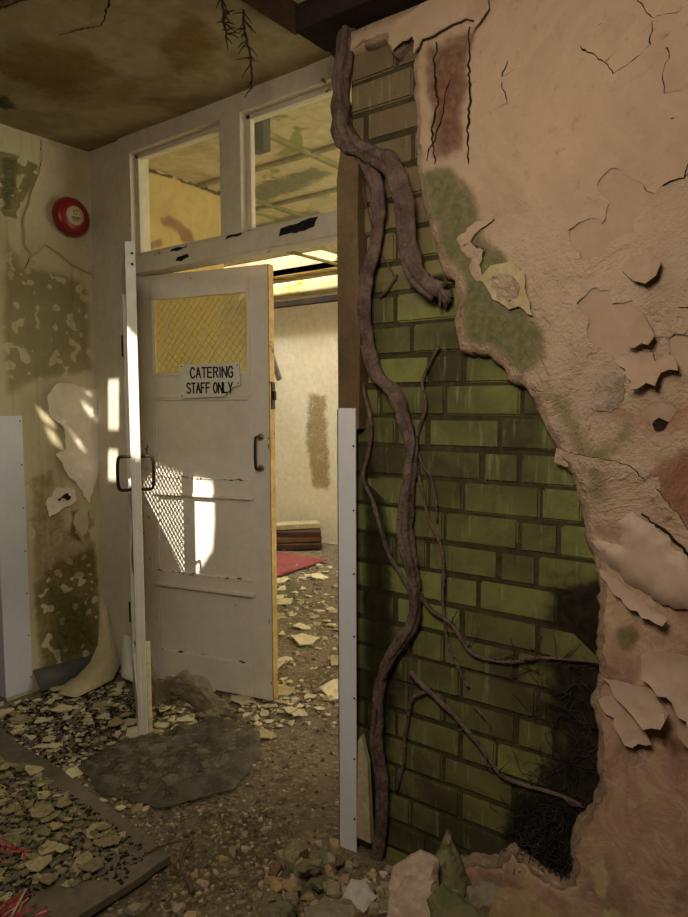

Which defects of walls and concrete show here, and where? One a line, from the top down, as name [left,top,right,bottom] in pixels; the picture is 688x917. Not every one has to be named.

leakage [433,275,452,310]
peeling [45,383,99,518]
flaking render [351,0,688,917]
leakage [35,552,99,667]